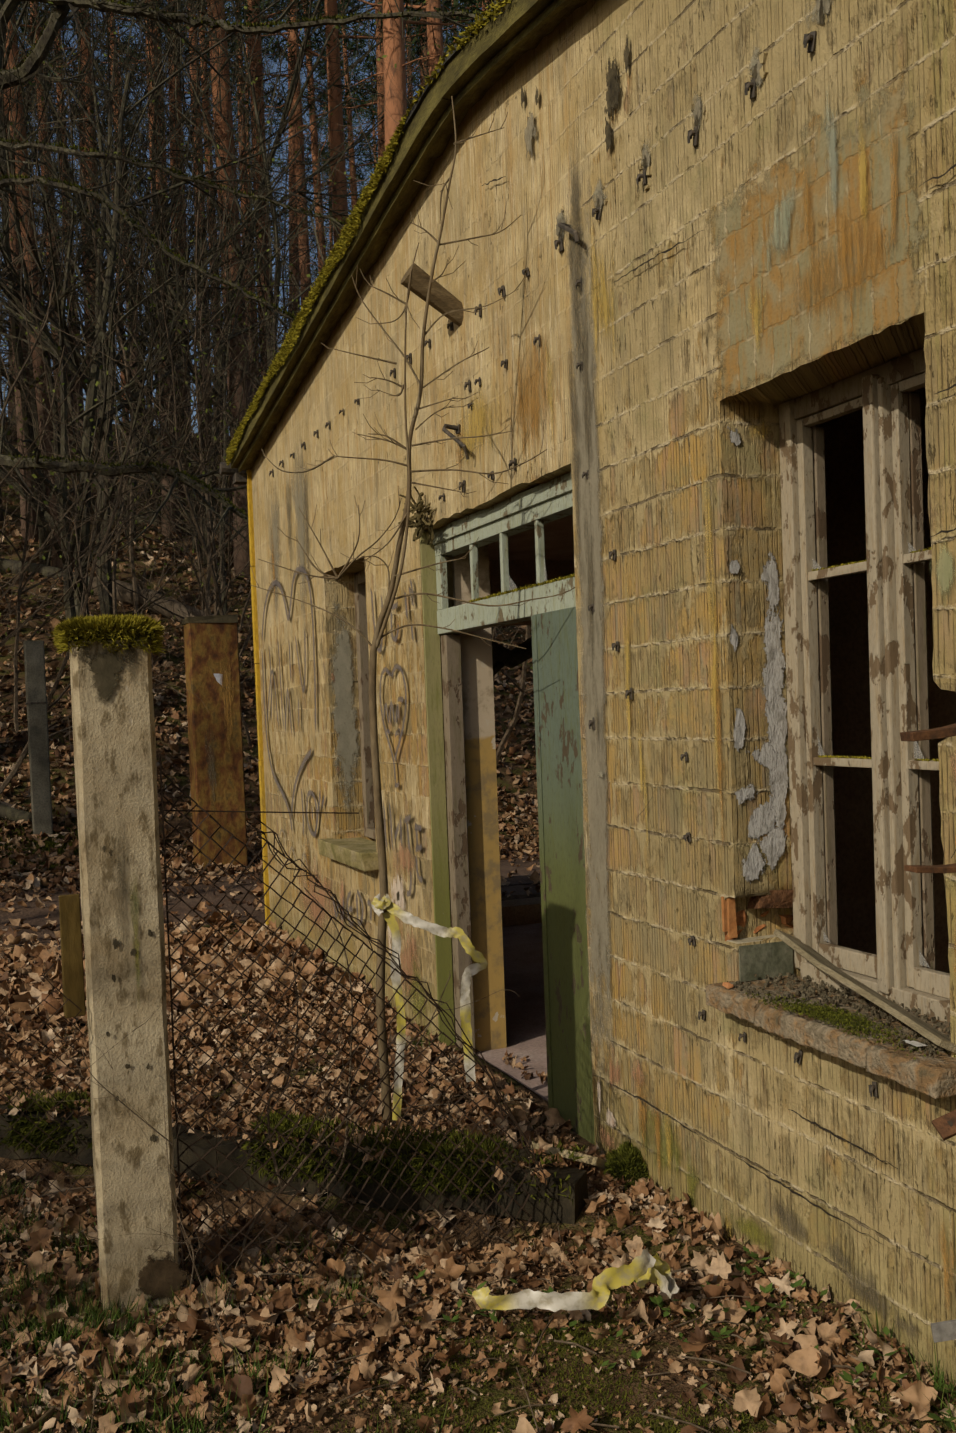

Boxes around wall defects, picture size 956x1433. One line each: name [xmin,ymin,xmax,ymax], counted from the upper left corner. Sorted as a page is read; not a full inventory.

corrosion [797,141,898,308]
crack [919,164,956,187]
flaking render [721,543,794,944]